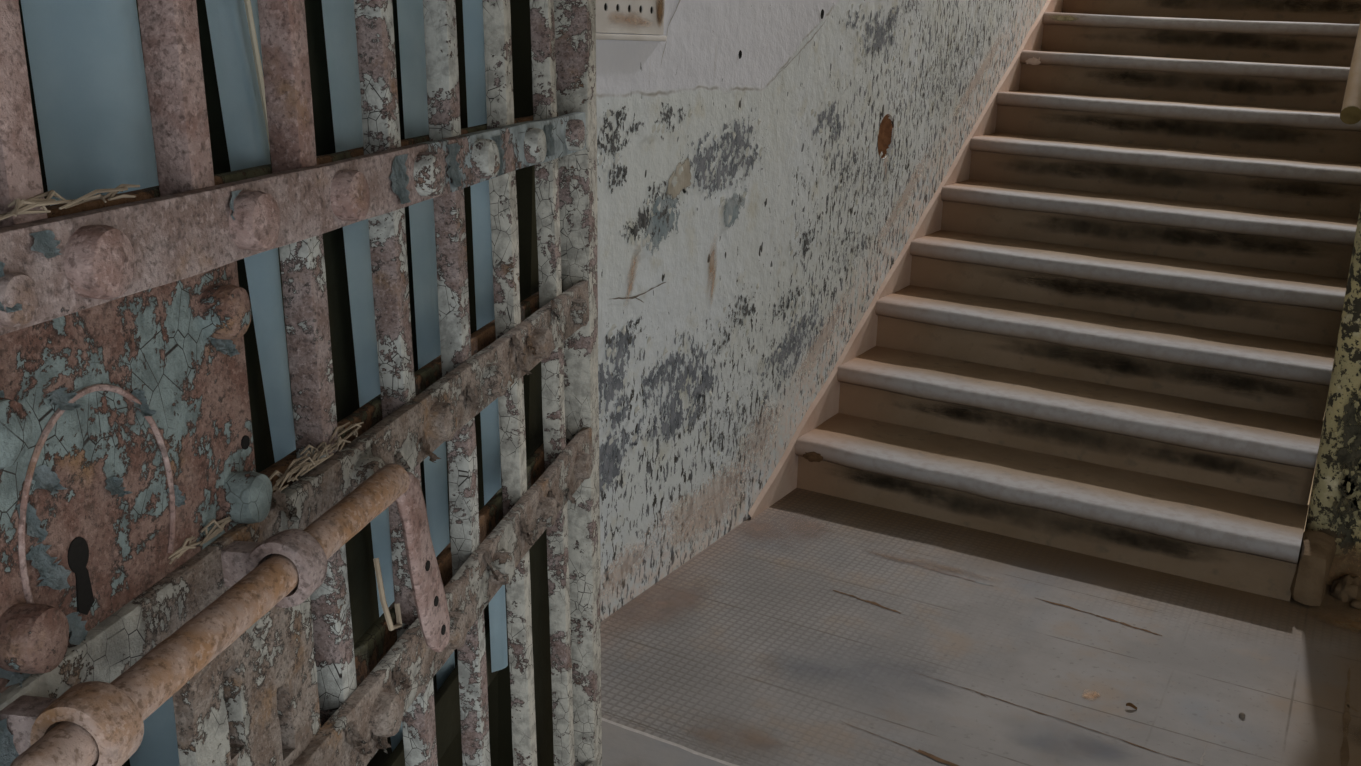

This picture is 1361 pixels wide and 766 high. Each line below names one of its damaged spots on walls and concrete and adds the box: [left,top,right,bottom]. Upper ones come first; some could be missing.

peeling [597,100,692,193]
peeling [620,109,771,256]
peeling [598,282,838,497]
crack [840,720,959,766]